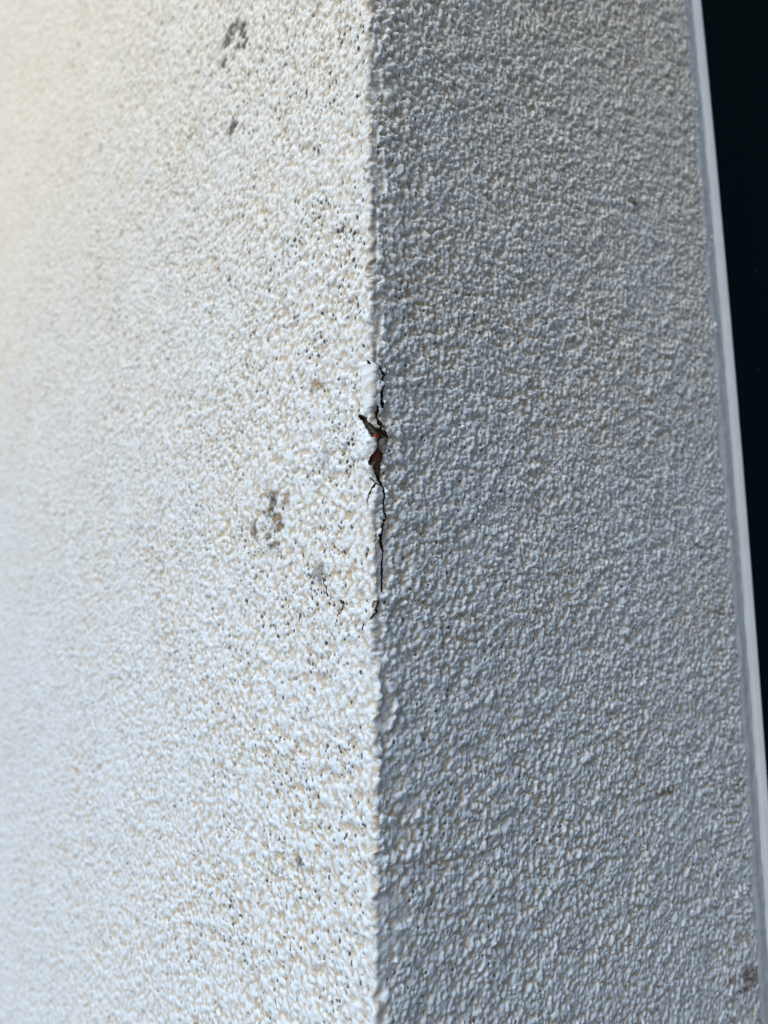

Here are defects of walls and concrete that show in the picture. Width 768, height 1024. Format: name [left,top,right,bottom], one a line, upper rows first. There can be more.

crack [367,360,388,408]
crack [362,471,387,631]